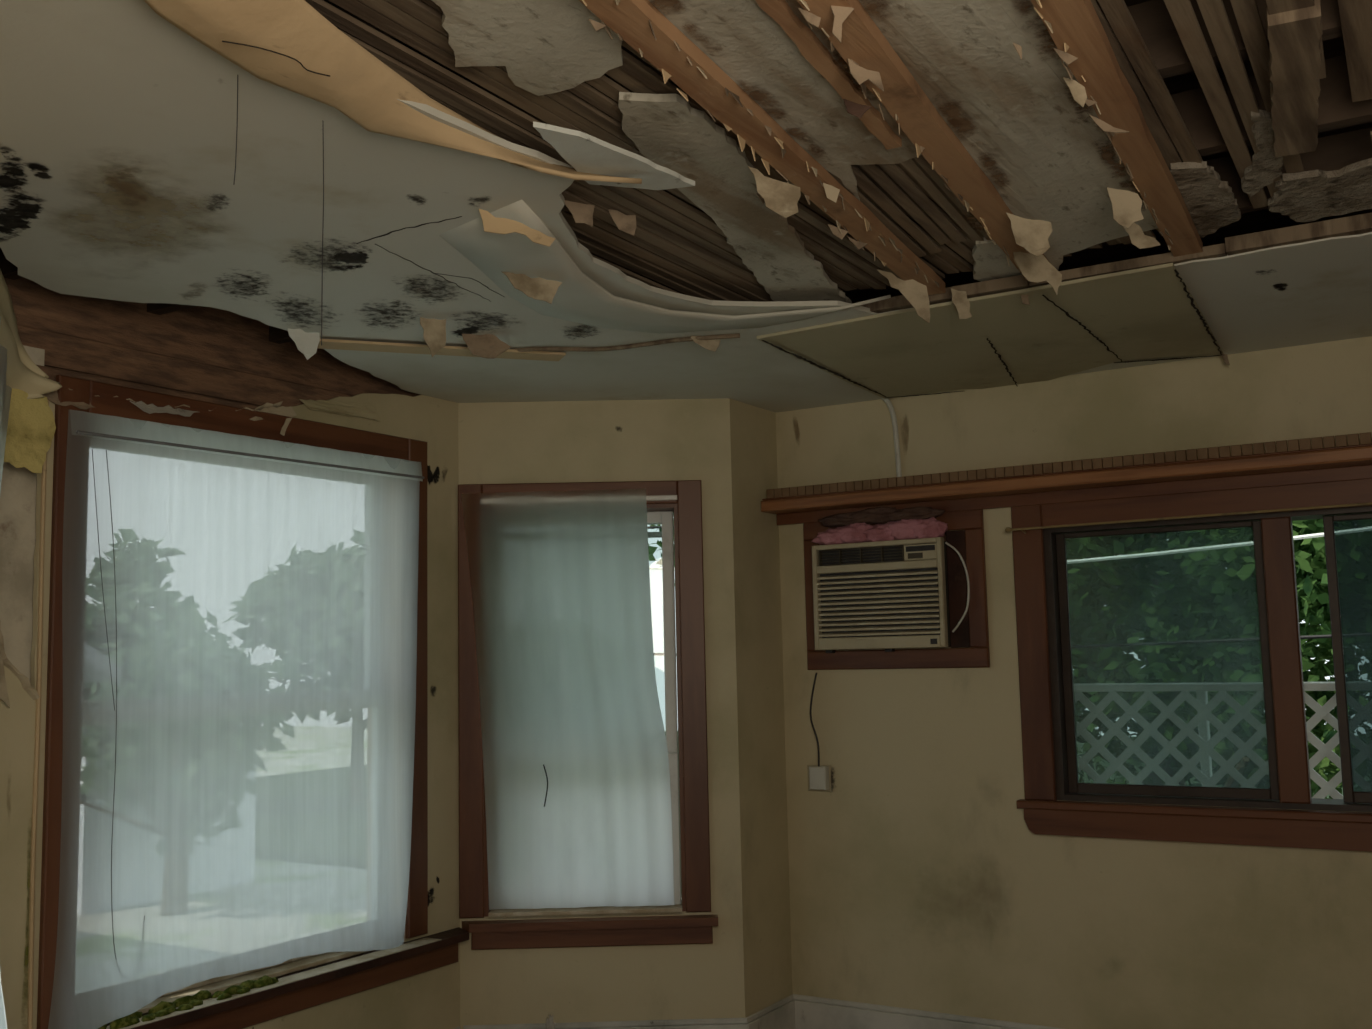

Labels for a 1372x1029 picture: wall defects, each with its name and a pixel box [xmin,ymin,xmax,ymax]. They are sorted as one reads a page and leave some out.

flaking render [798,0,900,134]
flaking render [1034,0,1173,250]
mould [0,147,51,240]
water stain [67,180,227,247]
mould [218,274,335,327]
mould [291,239,369,271]
mould [359,278,518,336]
flaking render [479,209,555,247]
flaking render [565,200,636,236]
flaking render [707,87,972,323]
flaking render [915,143,1062,305]
spalling [0,453,47,1029]